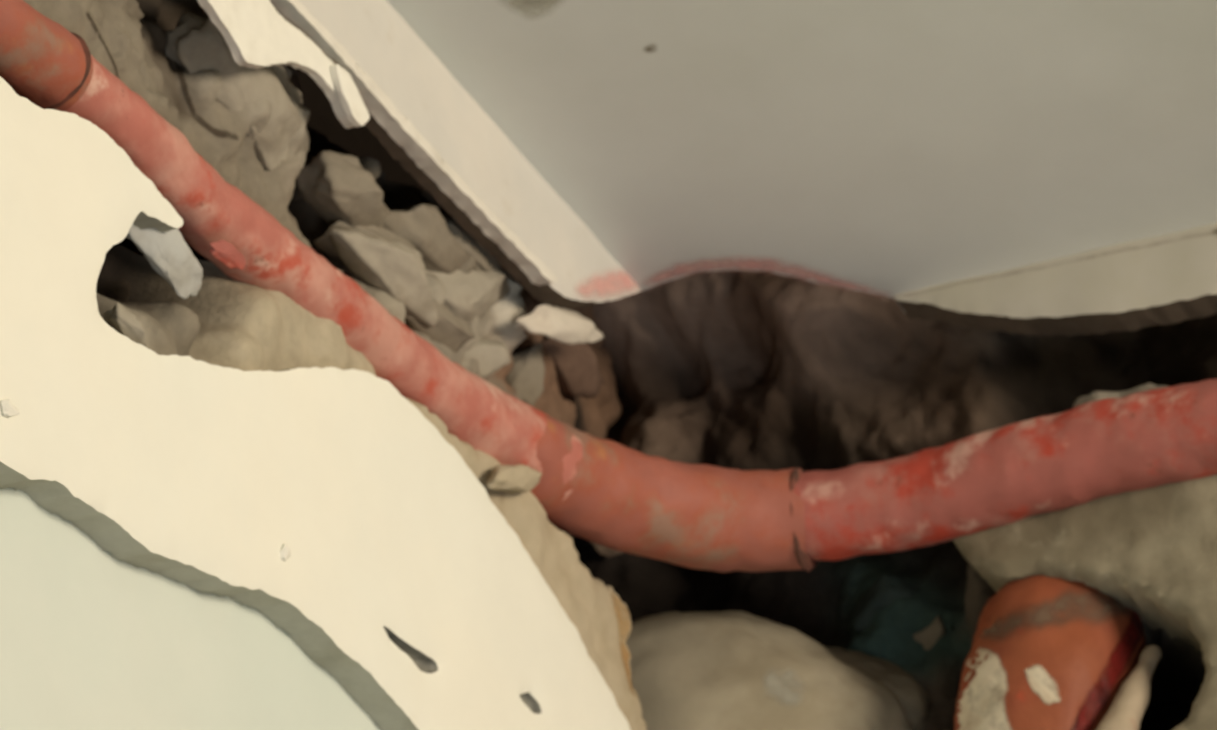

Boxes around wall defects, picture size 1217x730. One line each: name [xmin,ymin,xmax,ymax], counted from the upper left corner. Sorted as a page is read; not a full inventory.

flaking render [23,0,1217,472]
hole [384,628,436,673]
peeling [556,475,1217,730]